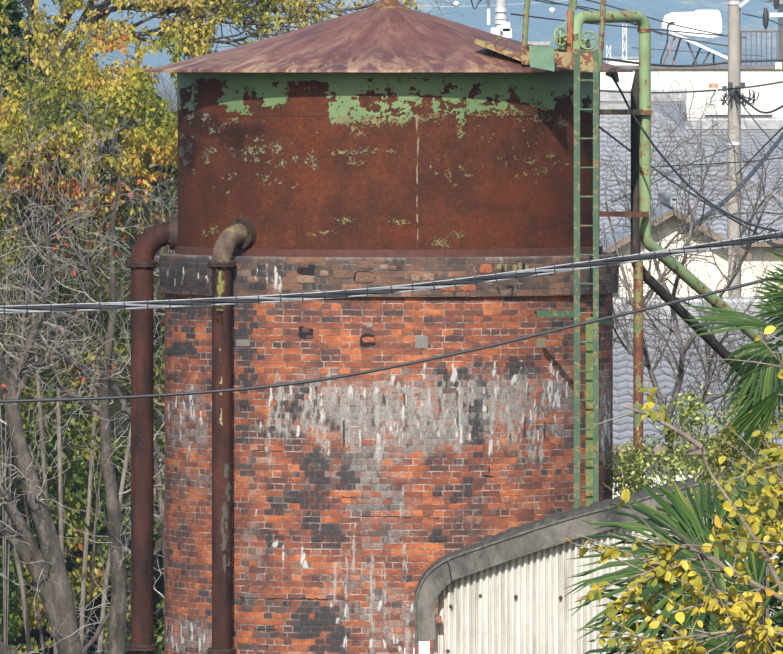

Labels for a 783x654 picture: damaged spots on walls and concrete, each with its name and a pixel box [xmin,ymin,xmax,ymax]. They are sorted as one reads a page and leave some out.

peeling [177,72,600,185]
damp [260,360,568,495]
rust [220,463,232,579]
efflorescence [330,540,355,623]
efflorescence [369,556,415,652]